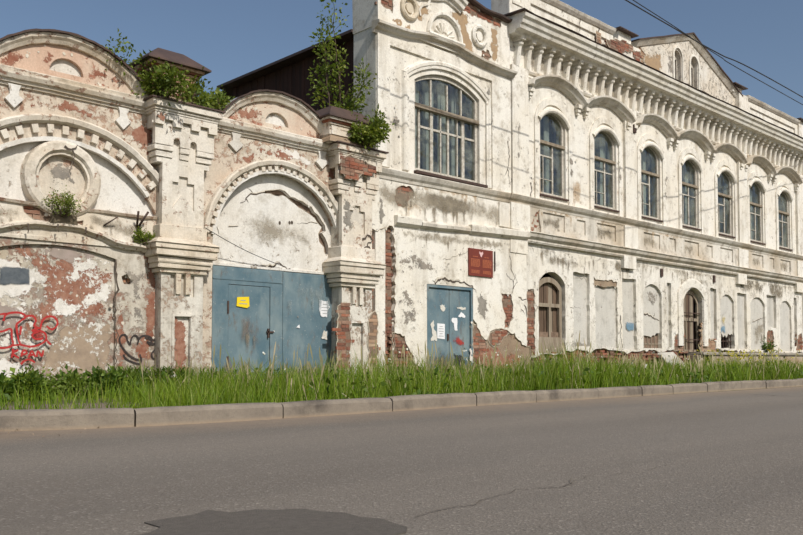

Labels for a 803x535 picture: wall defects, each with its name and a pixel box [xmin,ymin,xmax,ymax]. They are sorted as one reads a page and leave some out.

flaking render [1,45,73,66]
flaking render [374,0,432,30]
flaking render [452,3,502,62]
flaking render [596,30,646,63]
flaking render [326,154,376,182]
flaking render [395,185,415,208]
flaking render [343,199,355,236]
flaking render [367,198,433,372]
flaking render [0,245,155,375]
flaking render [331,302,355,370]
flaking render [471,289,689,369]
flaking render [794,333,803,351]